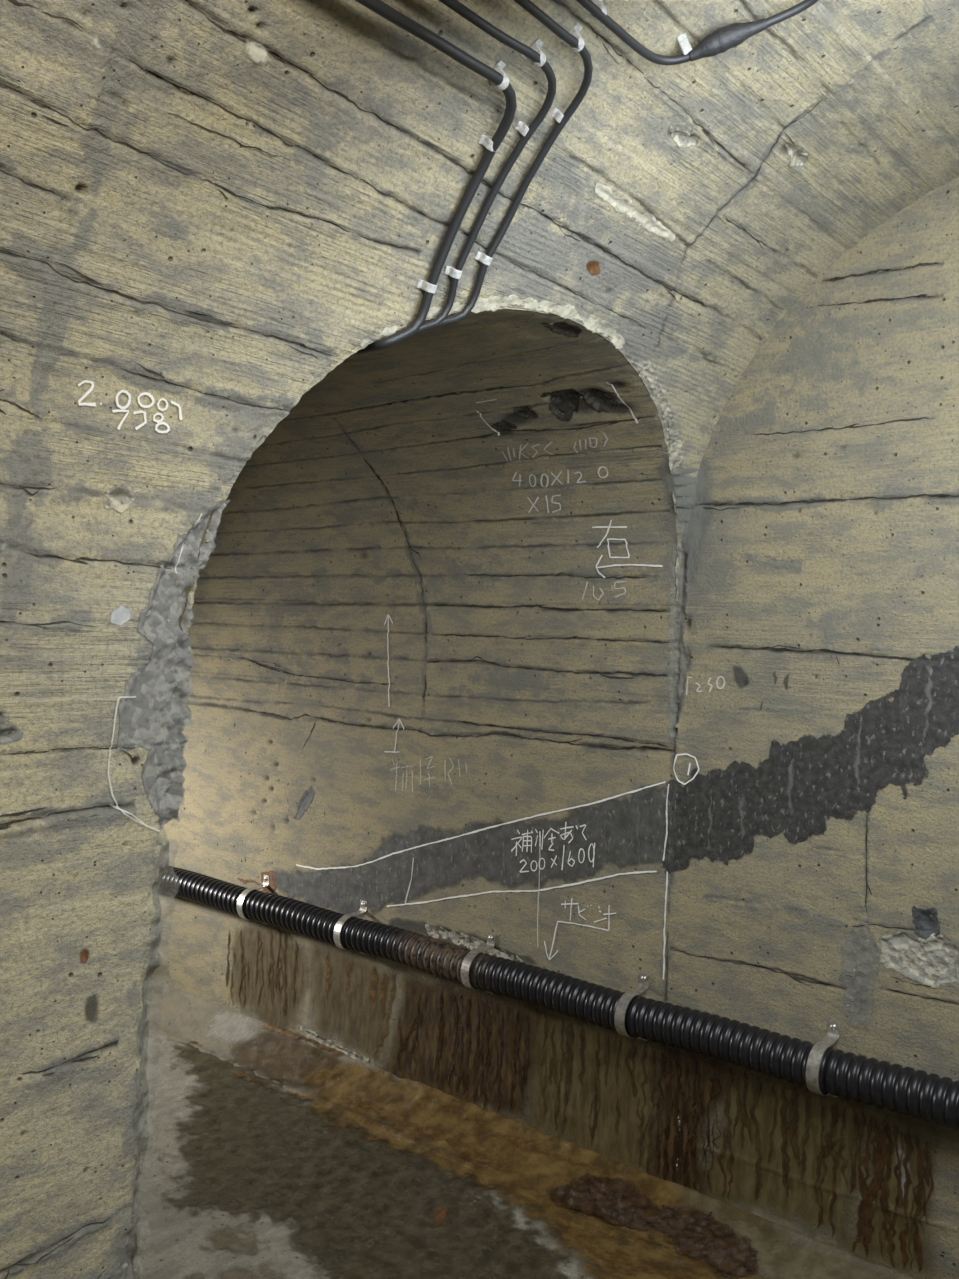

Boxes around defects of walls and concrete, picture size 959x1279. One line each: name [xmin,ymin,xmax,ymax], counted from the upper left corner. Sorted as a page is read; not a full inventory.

crack [0,84,412,251]
crack [0,249,333,358]
crack [819,262,940,306]
spalling [490,388,618,430]
crack [676,494,959,511]
spalling [116,500,230,829]
spalling [0,713,23,744]
spalling [879,906,959,989]
water stain [166,1012,570,1279]
corrosion [226,926,934,1279]
water stain [897,1148,909,1198]
water stain [691,1189,908,1279]